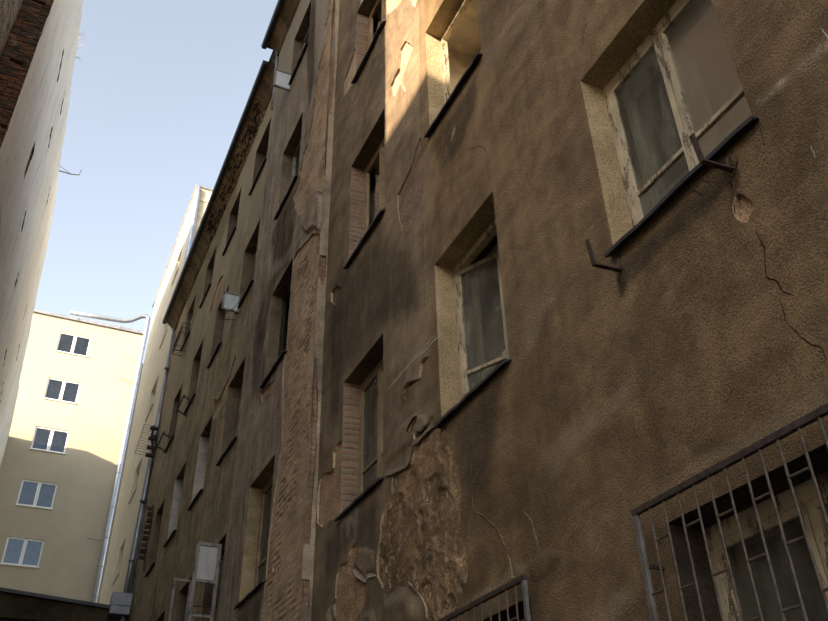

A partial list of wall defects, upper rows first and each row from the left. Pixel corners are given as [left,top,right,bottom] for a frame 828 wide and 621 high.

flaking render [293,0,336,215]
flaking render [343,0,372,96]
flaking render [387,0,417,14]
flaking render [390,41,414,98]
flaking render [732,193,755,223]
crack [755,232,827,360]
flaking render [401,356,429,399]
flaking render [260,233,342,621]
flaking render [321,415,468,621]